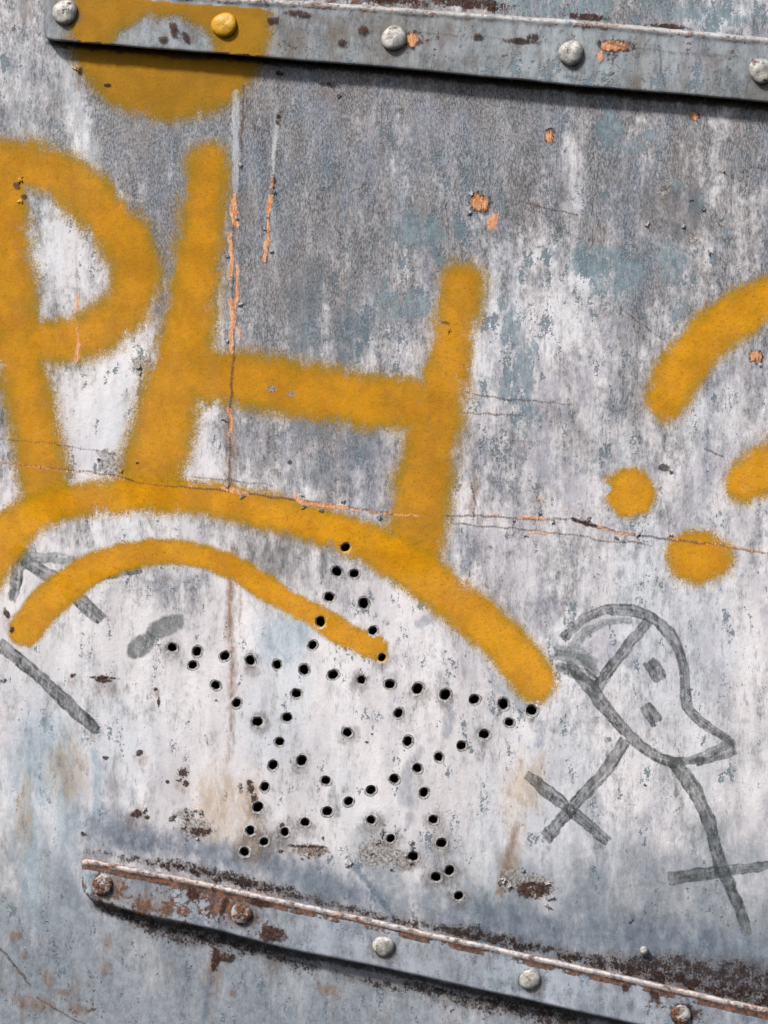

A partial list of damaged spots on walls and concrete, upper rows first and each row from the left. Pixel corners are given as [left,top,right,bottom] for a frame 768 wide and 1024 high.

corrosion [432,0,516,14]
corrosion [267,9,312,25]
corrosion [562,12,607,21]
corrosion [405,31,423,48]
corrosion [503,33,540,44]
corrosion [596,39,636,62]
peeling [545,127,555,144]
peeling [466,189,498,230]
peeling [748,350,764,366]
crack [1,439,420,520]
crack [446,488,765,553]
corrosion [89,850,768,1024]